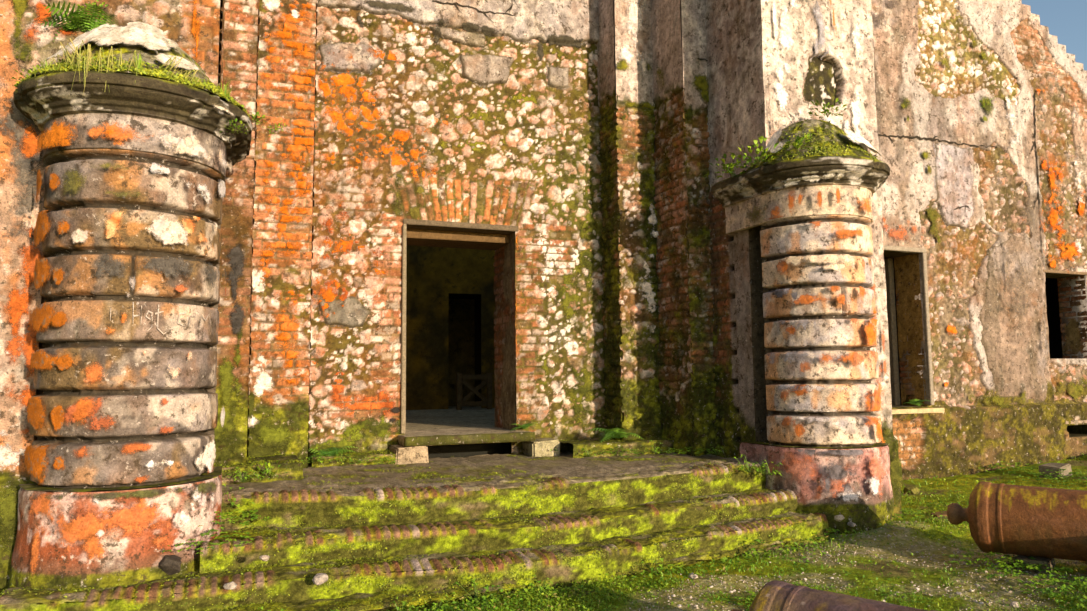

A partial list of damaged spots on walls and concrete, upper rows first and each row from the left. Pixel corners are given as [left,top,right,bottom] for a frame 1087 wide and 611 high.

flaking render [317,0,599,90]
flaking render [914,0,1087,409]
damp [93,253,193,296]
damp [206,244,325,428]
flaking render [314,295,371,328]